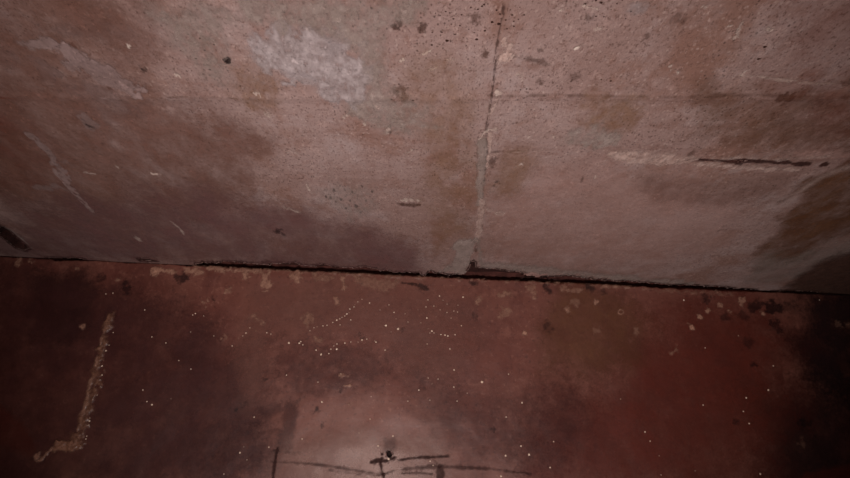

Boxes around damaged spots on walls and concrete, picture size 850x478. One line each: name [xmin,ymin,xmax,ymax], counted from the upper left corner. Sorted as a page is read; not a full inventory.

leakage [0,0,425,273]
crack [0,90,850,299]
crack [497,37,515,65]
leakage [760,161,850,268]
leakage [0,264,259,478]
leakage [273,435,440,478]
leakage [764,254,850,478]